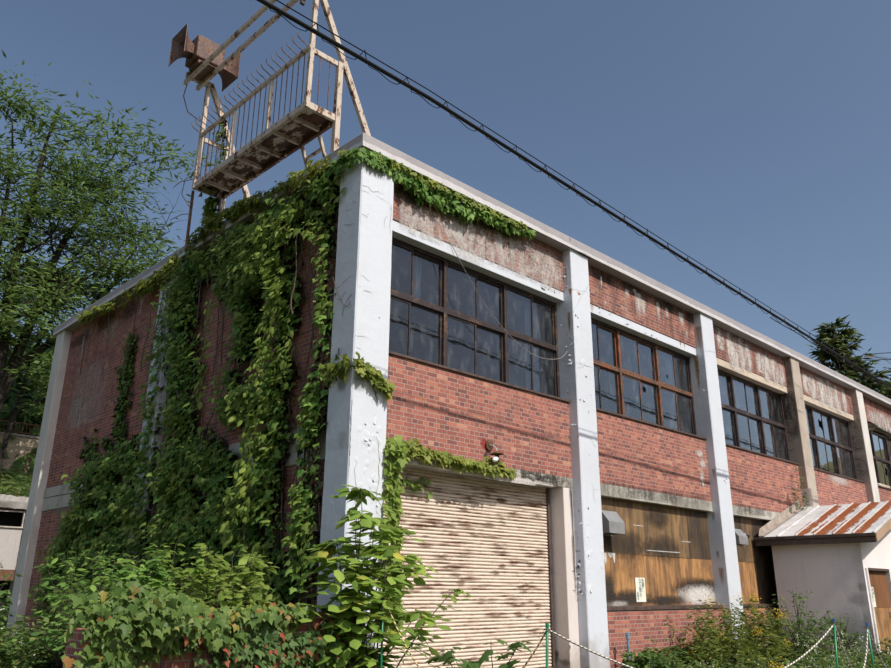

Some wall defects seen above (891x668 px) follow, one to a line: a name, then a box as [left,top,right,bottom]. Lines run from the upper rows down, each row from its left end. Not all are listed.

leakage [397,189,559,287]
leakage [717,328,791,384]
leakage [803,374,847,412]
rust [797,501,891,536]